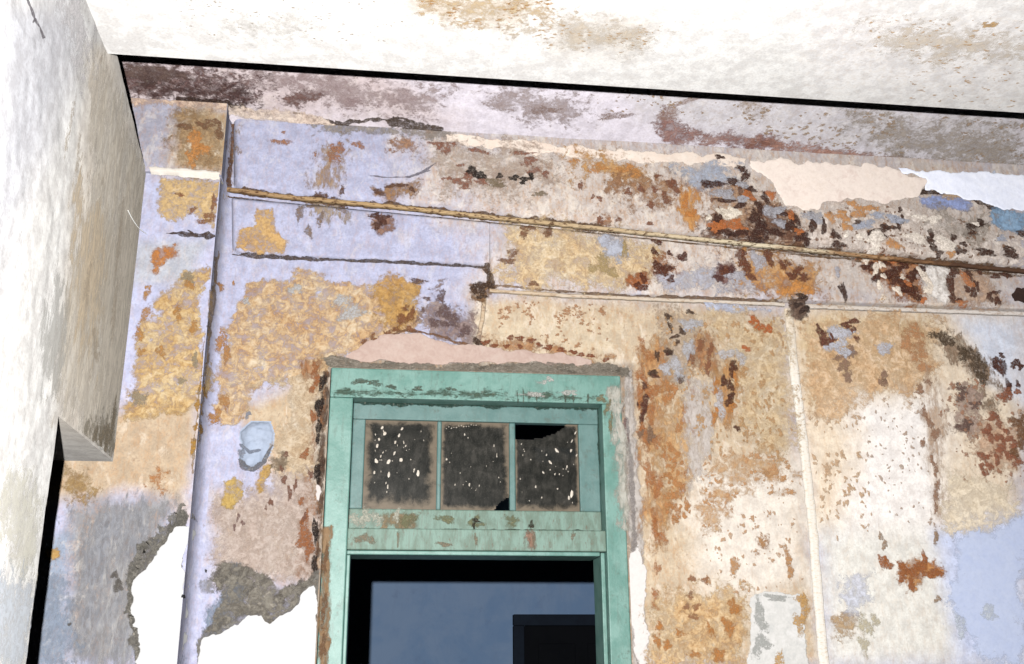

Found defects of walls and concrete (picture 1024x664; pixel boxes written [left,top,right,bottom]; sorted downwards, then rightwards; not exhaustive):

crack [167,230,782,303]
crack [176,96,1022,277]
rust [625,240,688,291]
water stain [478,82,1024,165]
peeling [695,157,1024,311]
peeling [123,267,592,585]
rust [631,329,802,664]
peeling [648,295,804,460]
rust [713,246,951,592]